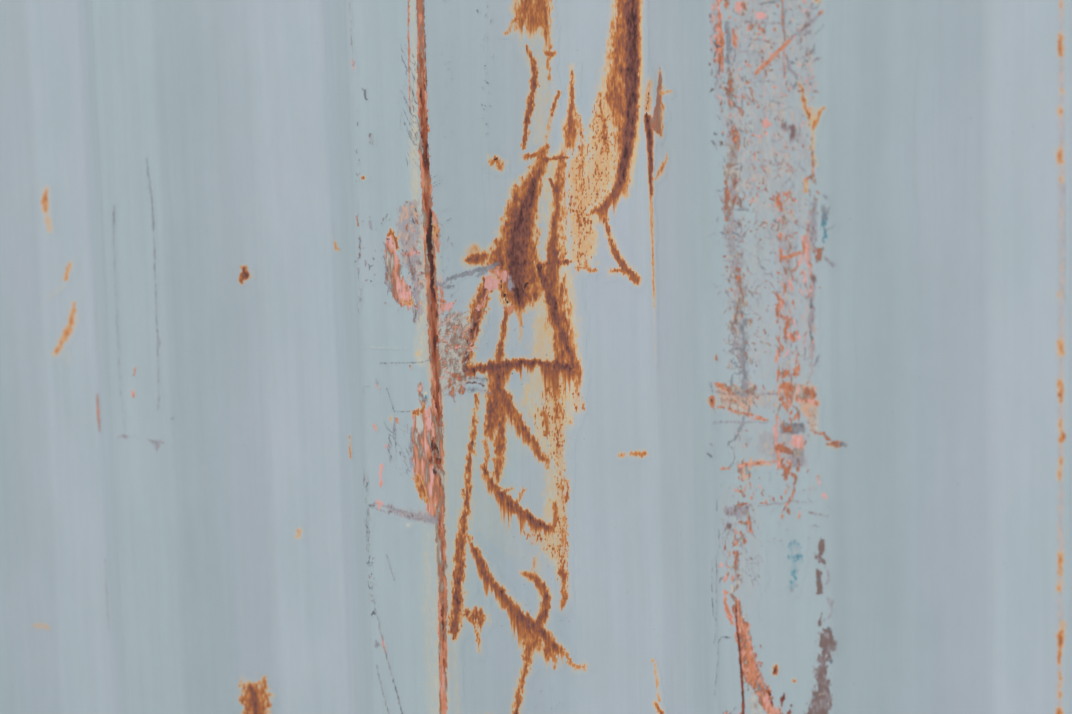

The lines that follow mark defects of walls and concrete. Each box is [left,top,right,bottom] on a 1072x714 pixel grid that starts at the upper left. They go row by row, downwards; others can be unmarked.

corrosion [36,180,56,237]
corrosion [44,256,97,368]
corrosion [235,260,257,289]
peeling [353,0,469,714]
corrosion [443,0,671,714]
peeling [704,0,840,521]
corrosion [1049,0,1072,714]
corrosion [230,667,279,714]
peeling [715,548,805,714]